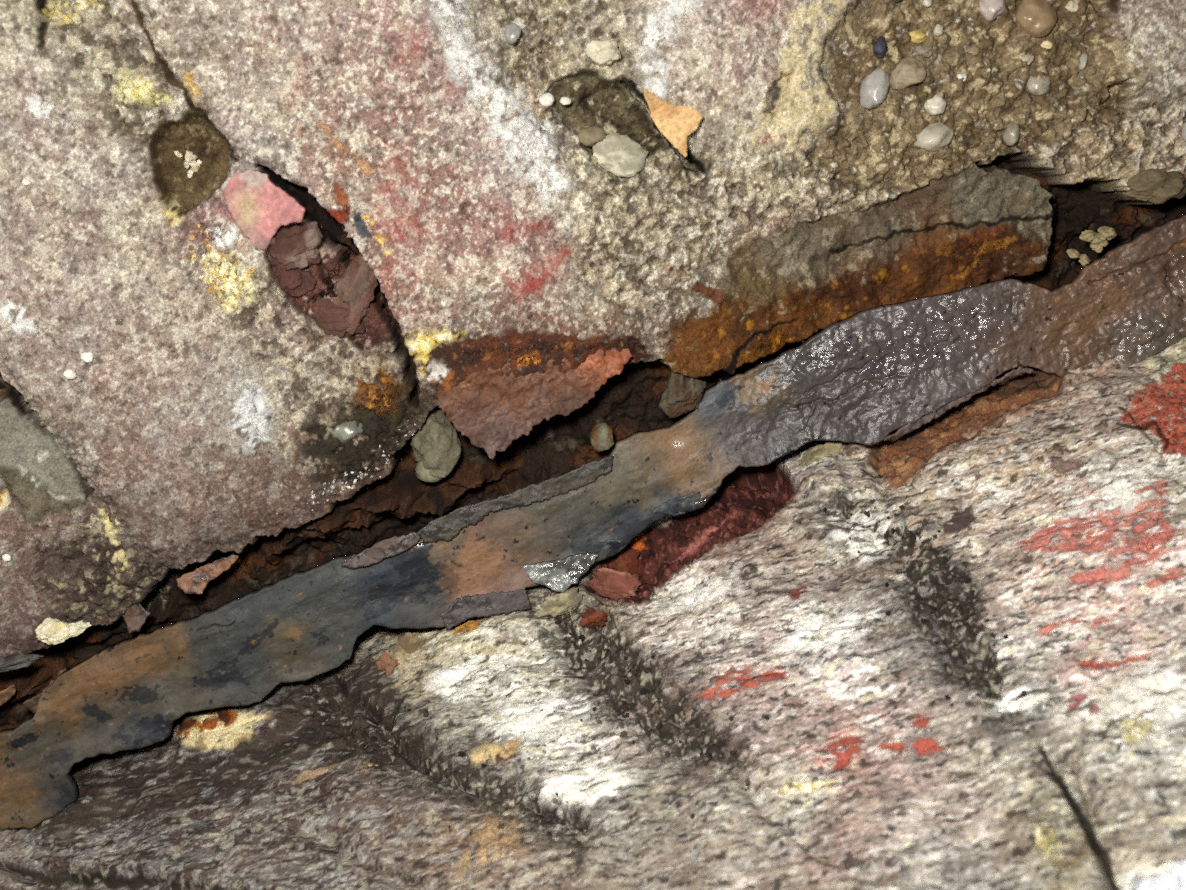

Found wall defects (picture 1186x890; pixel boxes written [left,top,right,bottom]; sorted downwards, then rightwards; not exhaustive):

spalling [149,112,393,349]
corrosion [670,223,1057,378]
corrosion [356,369,412,418]
corrosion [416,328,653,459]
corrosion [869,366,1062,490]
corrosion [341,456,613,569]
corrosion [122,603,151,634]
corrosion [176,554,239,594]
corrosion [440,589,532,630]
corrosion [0,667,67,714]
crack [1037,745,1119,890]